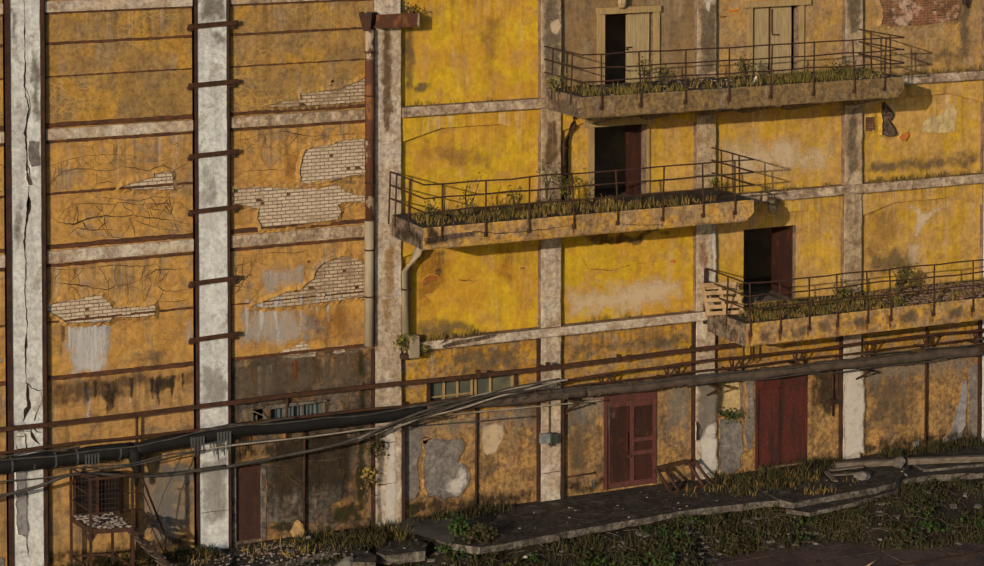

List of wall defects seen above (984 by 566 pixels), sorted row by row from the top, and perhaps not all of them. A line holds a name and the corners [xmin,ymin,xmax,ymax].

flaking render [875,0,964,31]
flaking render [262,73,365,112]
flaking render [862,102,958,141]
flaking render [231,134,365,233]
crack [0,0,192,550]
flaking render [47,289,160,328]
flaking render [244,250,364,313]
water stain [54,320,192,411]
flaking render [405,424,472,502]
flaking render [698,381,755,475]